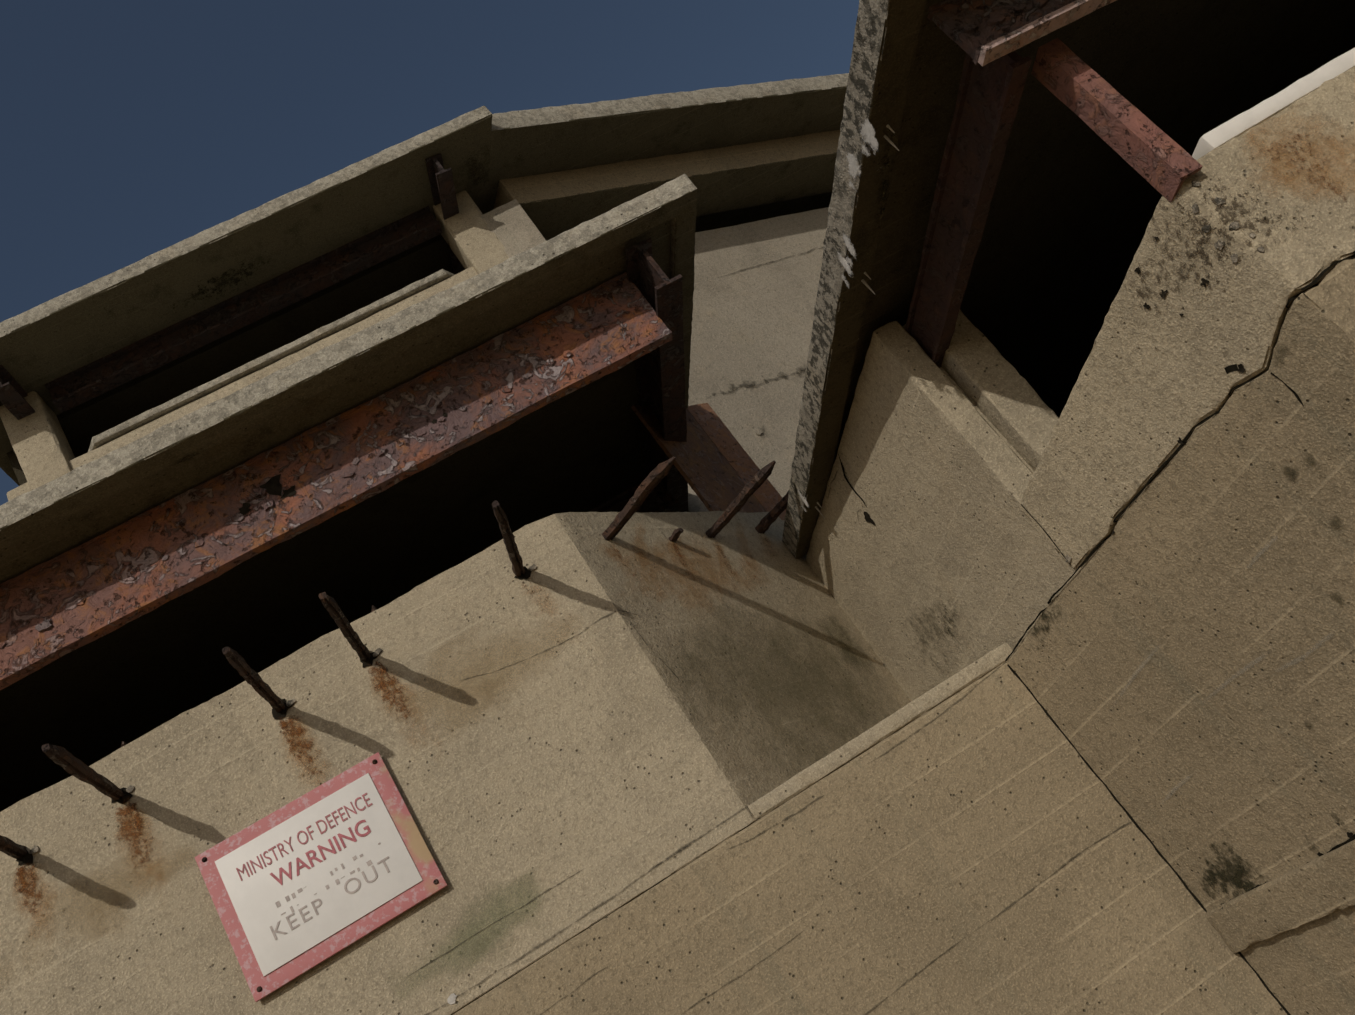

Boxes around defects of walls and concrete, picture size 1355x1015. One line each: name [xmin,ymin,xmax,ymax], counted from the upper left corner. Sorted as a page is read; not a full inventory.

spalling [1122,161,1320,319]
crack [1285,251,1355,308]
crack [828,454,875,526]
corrosion [514,564,537,591]
crack [881,364,1304,916]
corrosion [360,648,410,718]
corrosion [272,698,321,778]
corrosion [14,846,42,912]
corrosion [111,785,153,867]
damp [1200,842,1260,898]
crack [1307,815,1355,863]